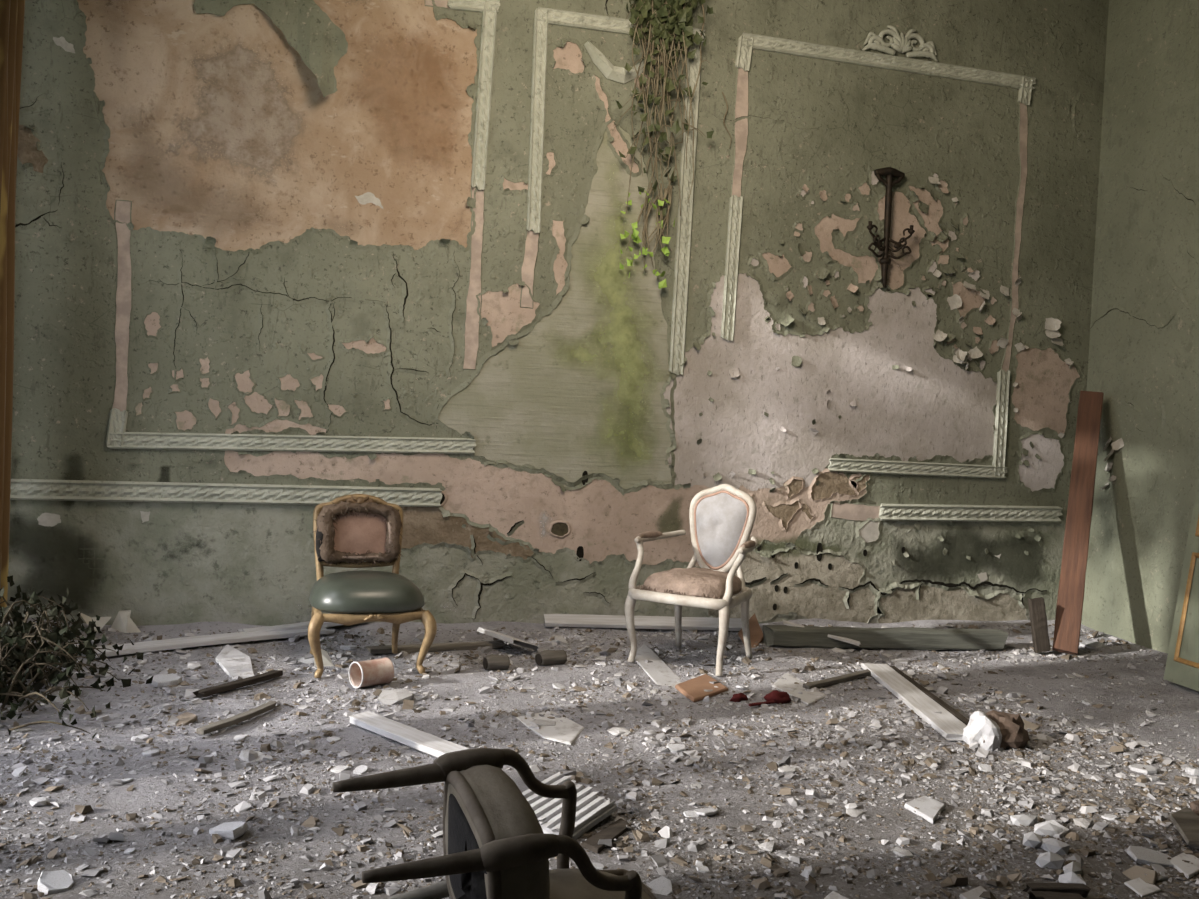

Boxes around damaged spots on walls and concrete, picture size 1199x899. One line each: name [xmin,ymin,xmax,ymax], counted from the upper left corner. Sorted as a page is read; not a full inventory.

spalling [53,0,481,256]
peeling [142,310,163,340]
crack [146,248,460,436]
spalling [220,37,1082,624]
peeling [133,349,349,436]
crack [448,520,610,619]
crack [745,573,1047,609]